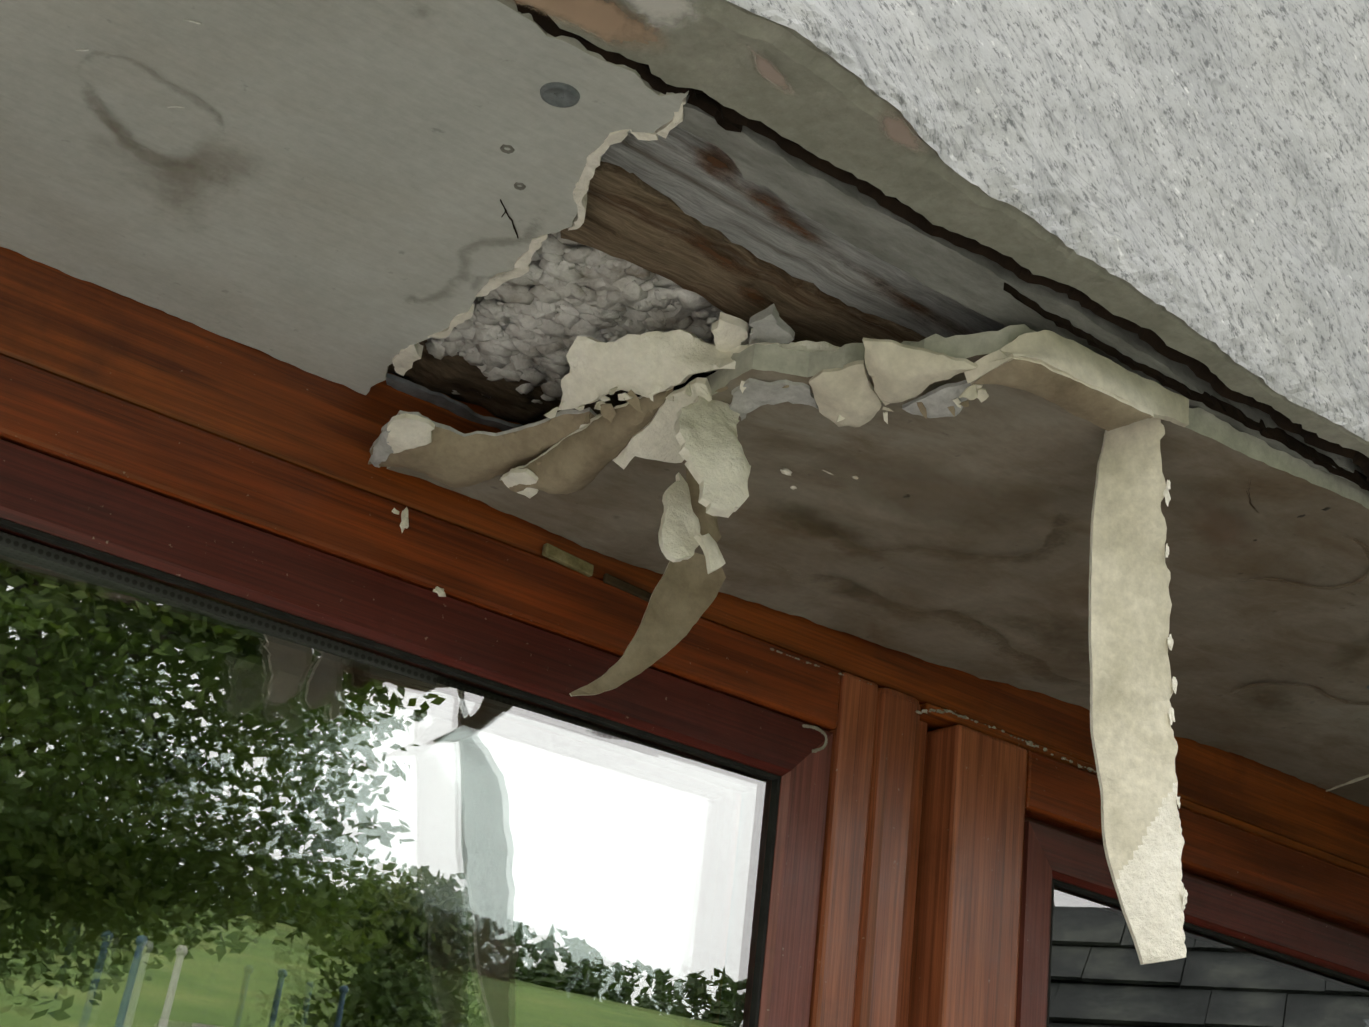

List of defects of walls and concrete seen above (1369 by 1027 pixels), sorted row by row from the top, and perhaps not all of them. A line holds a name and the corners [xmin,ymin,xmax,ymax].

spalling [392,234,548,376]
crack [500,199,519,239]
spalling [568,96,687,230]
peeling [368,304,989,696]
crack [514,0,1369,491]
peeling [1089,418,1188,965]